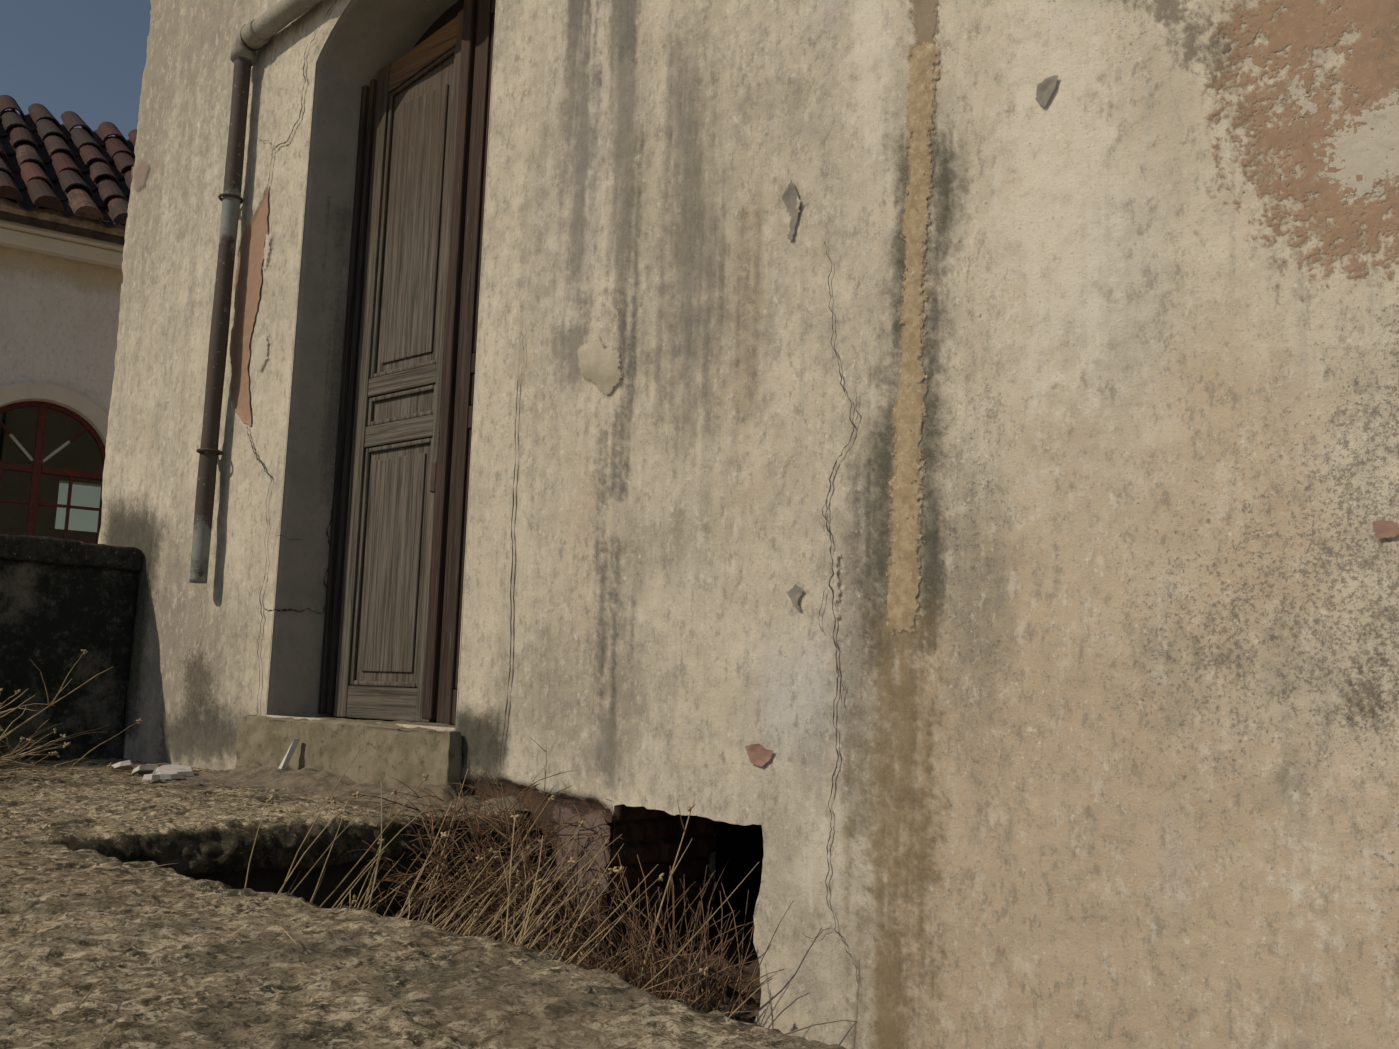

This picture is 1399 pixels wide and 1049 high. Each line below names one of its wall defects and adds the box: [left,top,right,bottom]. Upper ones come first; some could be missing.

flaking render [229,184,272,426]
leakage [566,0,589,300]
leakage [598,0,636,497]
spalling [1036,75,1058,107]
peeling [1123,0,1399,300]
leakage [594,539,618,775]
crack [802,242,858,983]
leakage [844,41,953,1049]
flaking render [461,778,612,957]